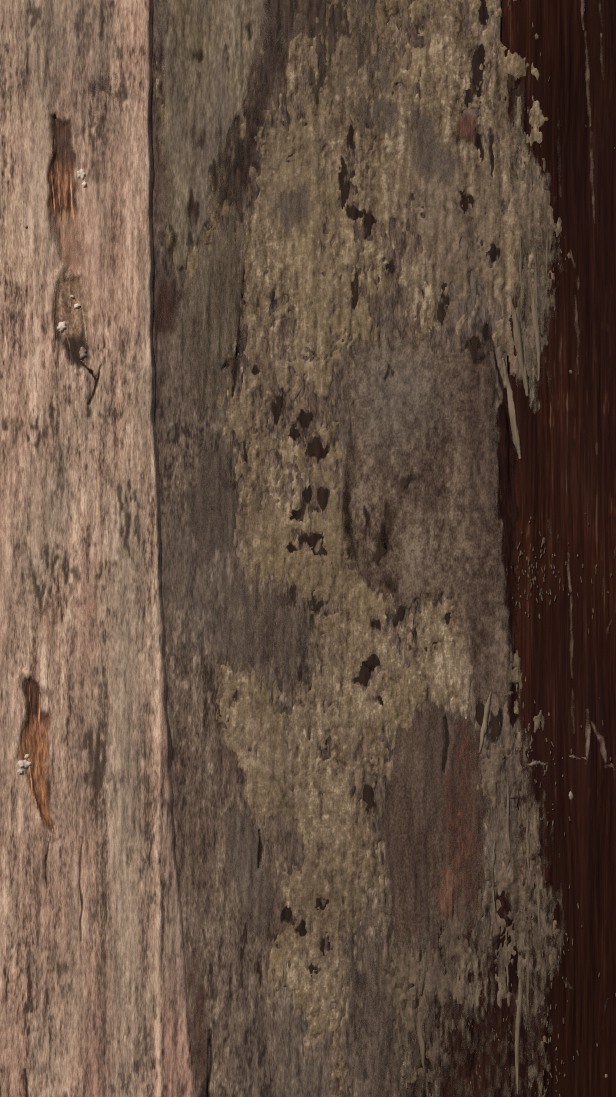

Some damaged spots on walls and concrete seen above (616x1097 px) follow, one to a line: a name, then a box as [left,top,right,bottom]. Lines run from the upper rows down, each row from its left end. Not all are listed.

spalling [478,0,489,25]
peeling [284,30,323,106]
peeling [440,43,548,146]
spalling [338,125,376,238]
spalling [474,133,494,177]
peeling [421,266,450,326]
crack [80,360,101,404]
spalling [288,409,328,463]
spalling [290,485,329,520]
spalling [286,533,327,556]
peeling [342,323,526,958]
spalling [280,906,307,936]